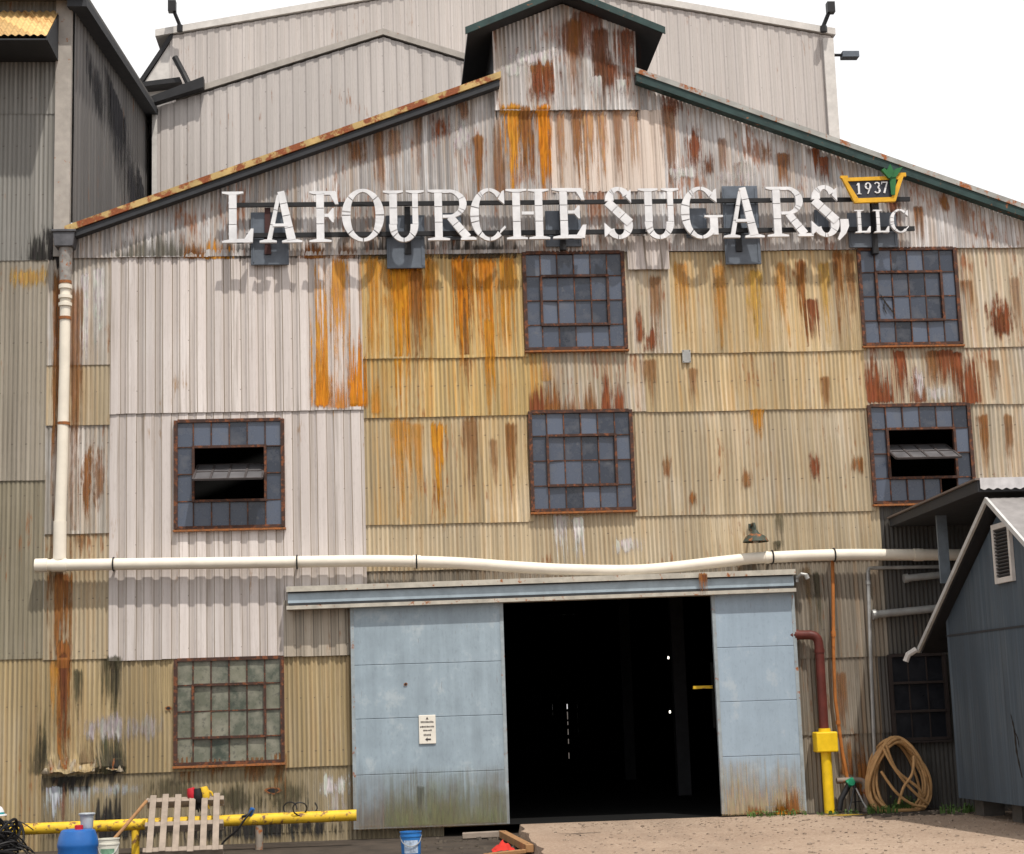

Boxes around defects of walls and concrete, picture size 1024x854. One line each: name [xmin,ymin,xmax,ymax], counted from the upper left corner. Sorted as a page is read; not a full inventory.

rust [472,11,639,193]
rust [660,95,714,183]
rust [10,267,104,514]
rust [300,243,428,409]
rust [451,255,516,394]
rust [864,350,999,404]
rust [47,572,73,820]
damp [74,669,83,703]
damp [101,655,121,717]
damp [31,725,156,839]
damp [170,783,342,842]
damp [357,795,500,829]